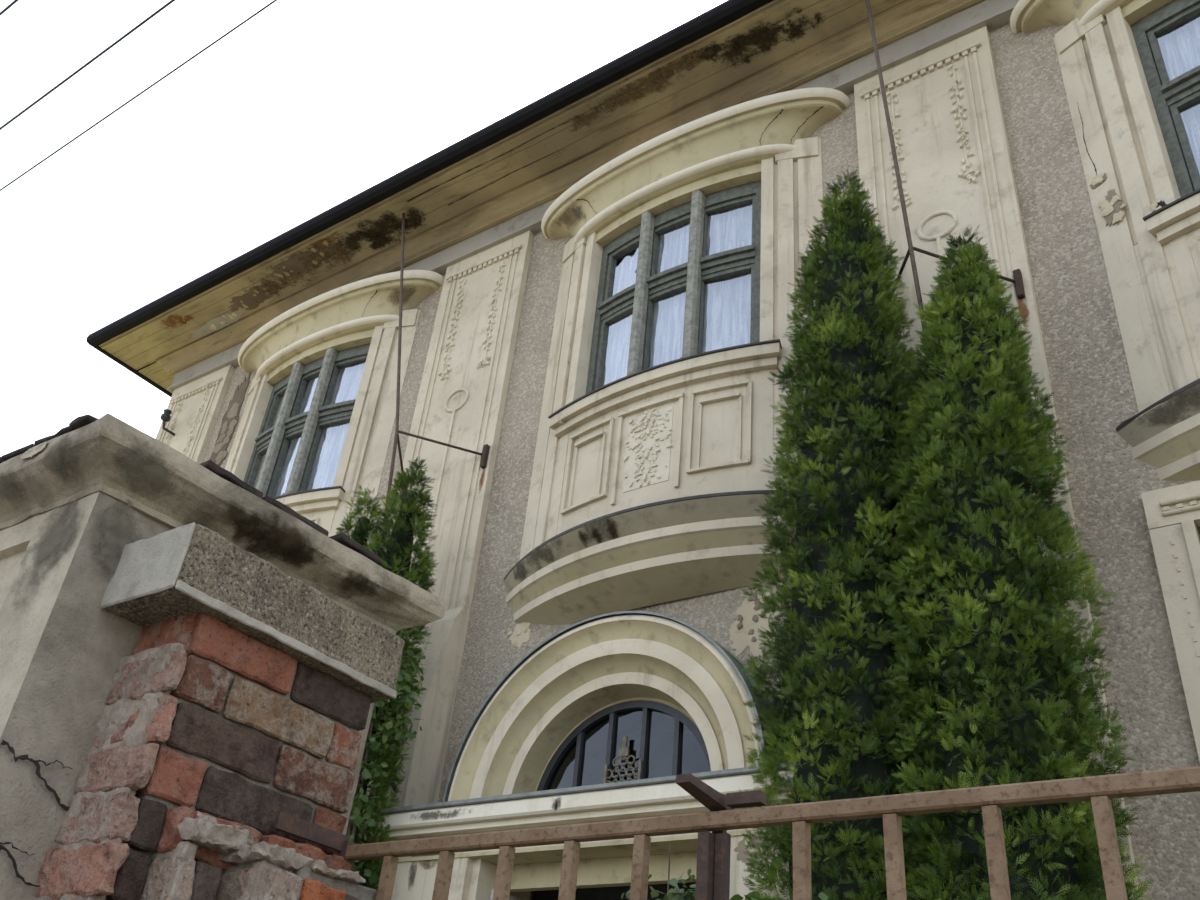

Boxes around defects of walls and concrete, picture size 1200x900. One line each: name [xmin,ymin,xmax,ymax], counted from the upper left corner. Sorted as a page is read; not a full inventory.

water stain [573,8,822,130]
spalling [1089,172,1127,227]
water stain [254,210,425,294]
water stain [44,435,76,479]
water stain [26,500,77,583]
water stain [93,445,173,575]
water stain [227,503,323,567]
water stain [343,572,406,600]
crack [1,740,73,811]
crack [0,842,40,887]